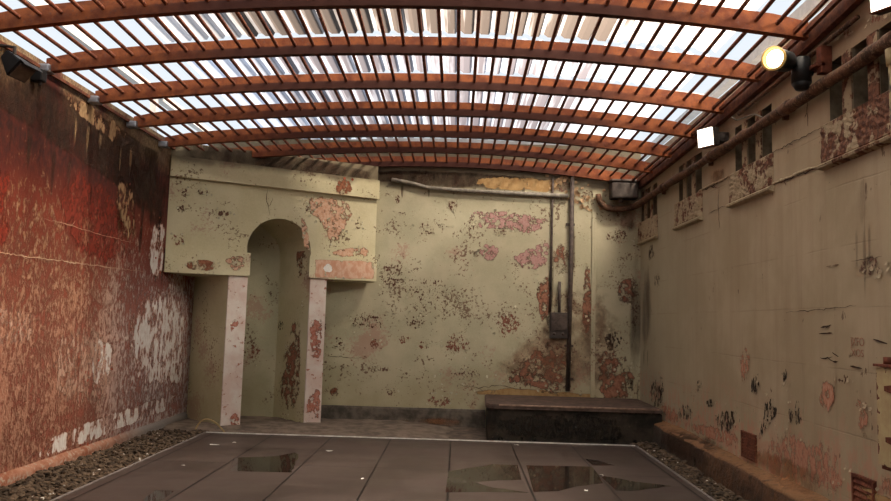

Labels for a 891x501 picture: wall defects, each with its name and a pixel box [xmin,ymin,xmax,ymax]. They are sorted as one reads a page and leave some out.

crack [0,252,142,272]
crack [47,219,133,243]
peeling [296,195,574,406]
peeling [280,317,324,422]
peeling [597,325,635,398]